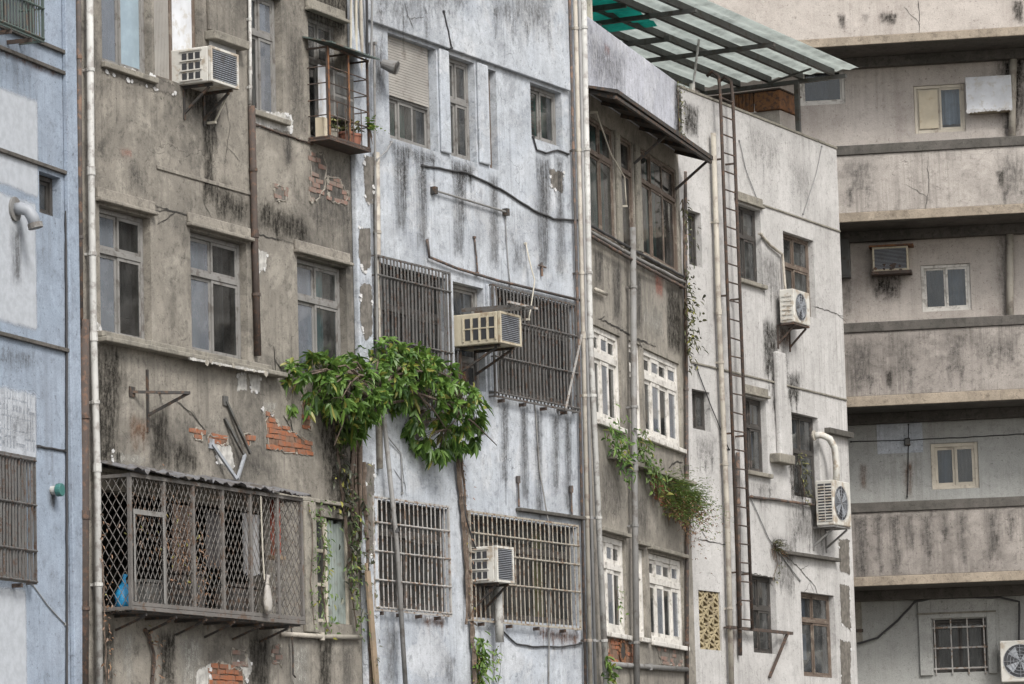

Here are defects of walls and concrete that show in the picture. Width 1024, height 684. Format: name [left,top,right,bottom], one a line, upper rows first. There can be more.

leakage [189,91,247,218]
leakage [261,203,307,240]
spalling [308,149,350,206]
leakage [394,146,434,224]
leakage [452,164,472,248]
leakage [537,162,562,261]
leakage [763,322,784,405]
spalling [189,393,314,469]
spalling [196,647,253,684]